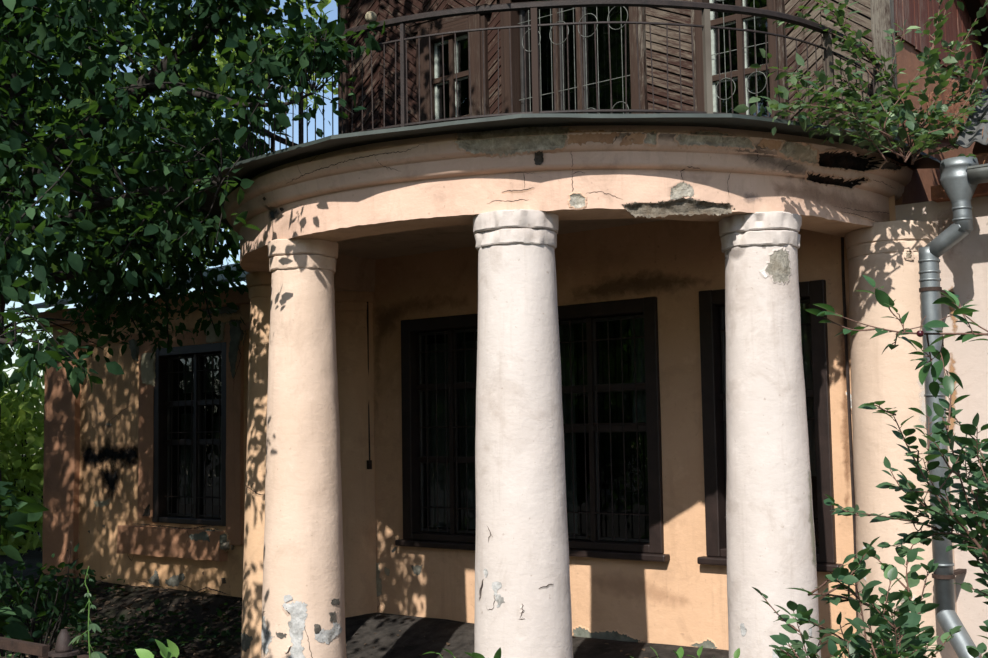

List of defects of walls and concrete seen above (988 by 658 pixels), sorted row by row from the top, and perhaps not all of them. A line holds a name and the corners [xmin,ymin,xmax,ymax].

crack [487,172,535,204]
spalling [454,126,735,218]
spalling [674,128,908,190]
flaking render [759,247,791,286]
flaking render [478,569,505,610]
flaking render [241,594,342,658]